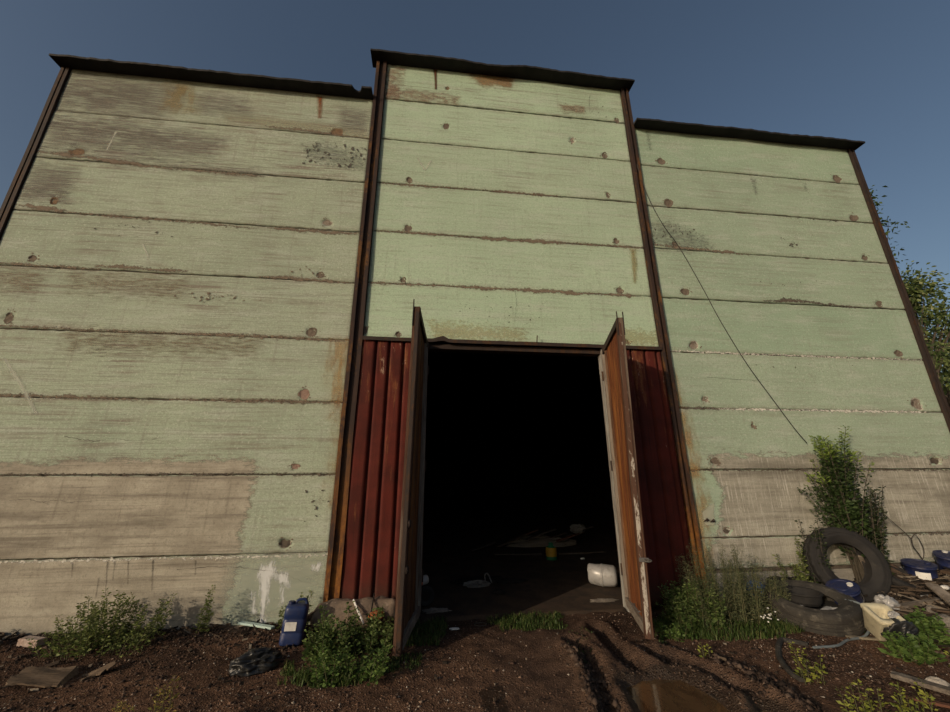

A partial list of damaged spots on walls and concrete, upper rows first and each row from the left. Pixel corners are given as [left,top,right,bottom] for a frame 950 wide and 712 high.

rust [385,68,456,103]
rust [471,73,512,87]
peeling [689,451,950,568]
peeling [0,455,328,636]
damp [274,573,289,601]